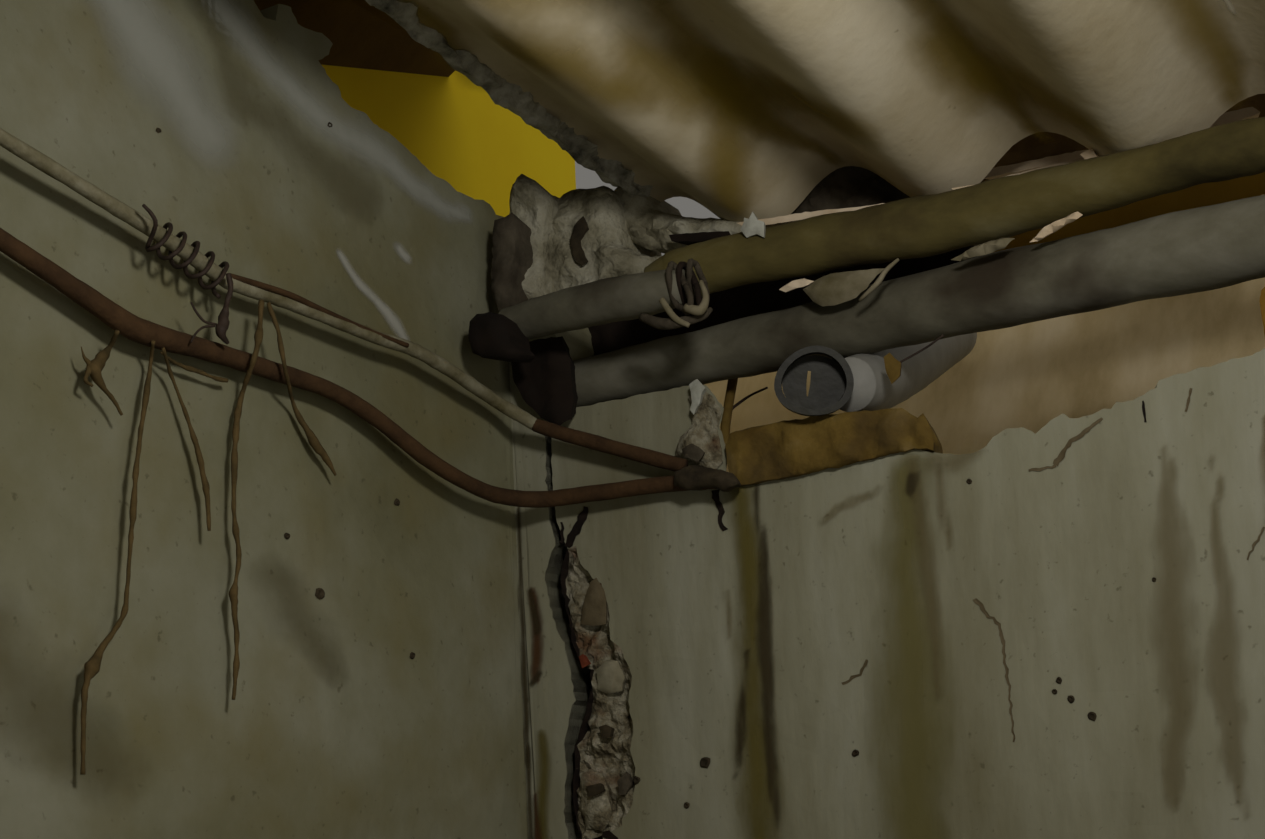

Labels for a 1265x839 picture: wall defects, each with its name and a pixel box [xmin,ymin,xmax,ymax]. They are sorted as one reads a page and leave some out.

crack [1029,417,1103,471]
crack [545,436,618,839]
spalling [566,546,640,839]
crack [973,598,1015,742]